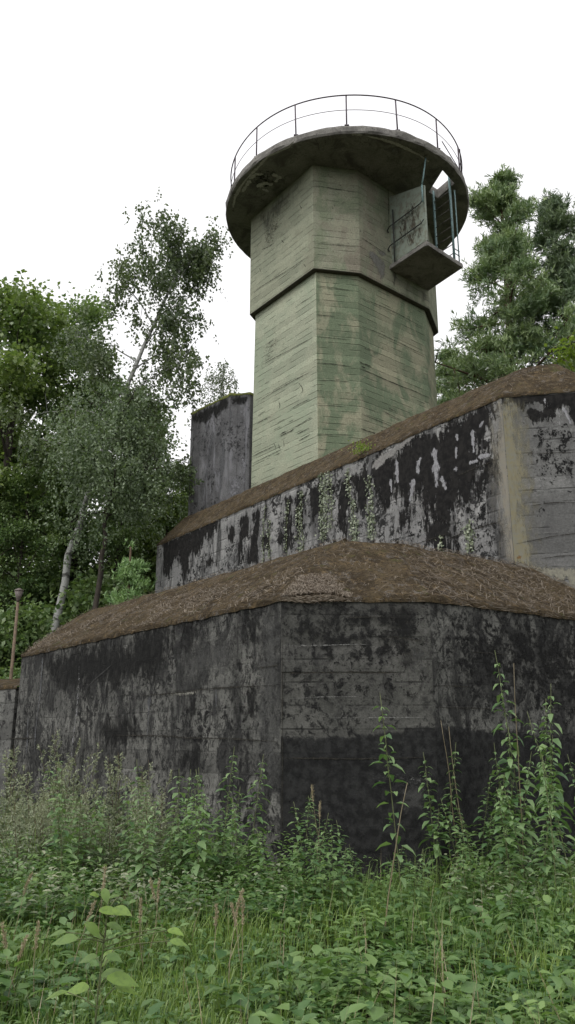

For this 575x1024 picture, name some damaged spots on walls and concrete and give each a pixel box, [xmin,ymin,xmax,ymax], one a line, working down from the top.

damp [162,393,575,586]
damp [26,620,202,754]
damp [240,606,575,883]